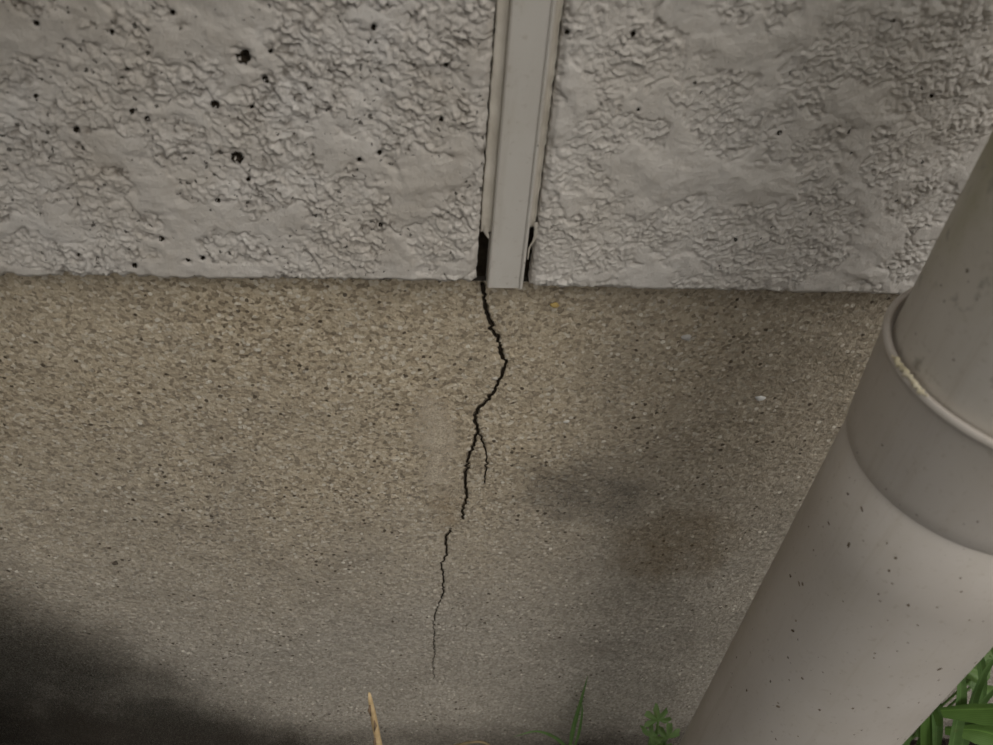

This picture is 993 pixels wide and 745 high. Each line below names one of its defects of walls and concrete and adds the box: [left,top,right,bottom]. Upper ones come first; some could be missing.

crack [432,283,508,679]